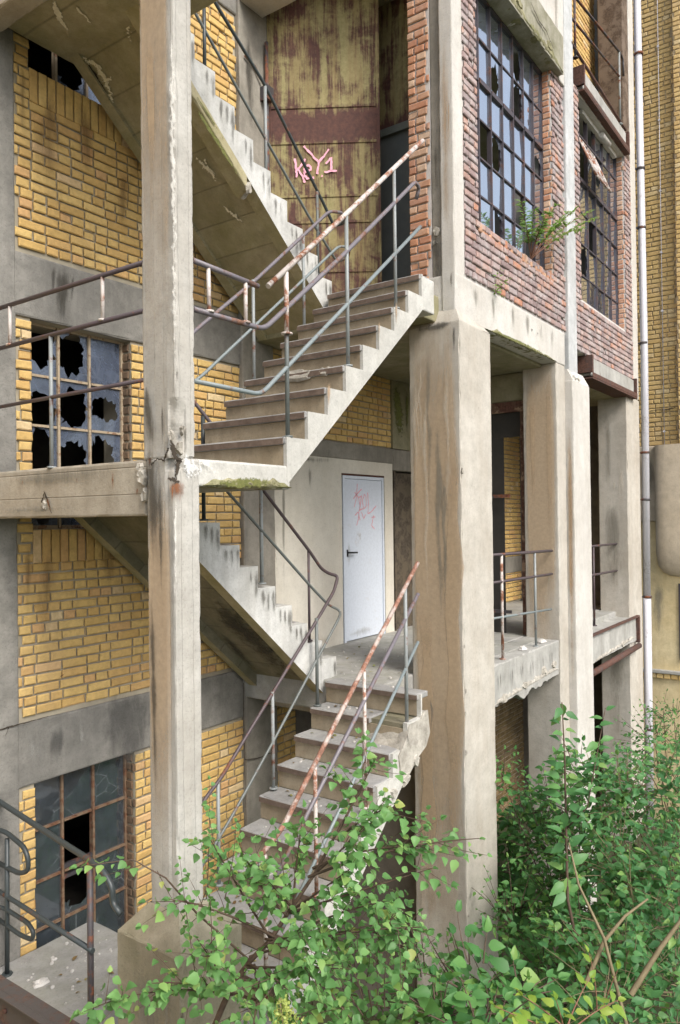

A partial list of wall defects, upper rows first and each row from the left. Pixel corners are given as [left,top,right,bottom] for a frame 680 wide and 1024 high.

crack [151,440,182,483]
leakage [219,602,275,662]
leakage [406,372,465,850]
spalling [367,710,430,799]